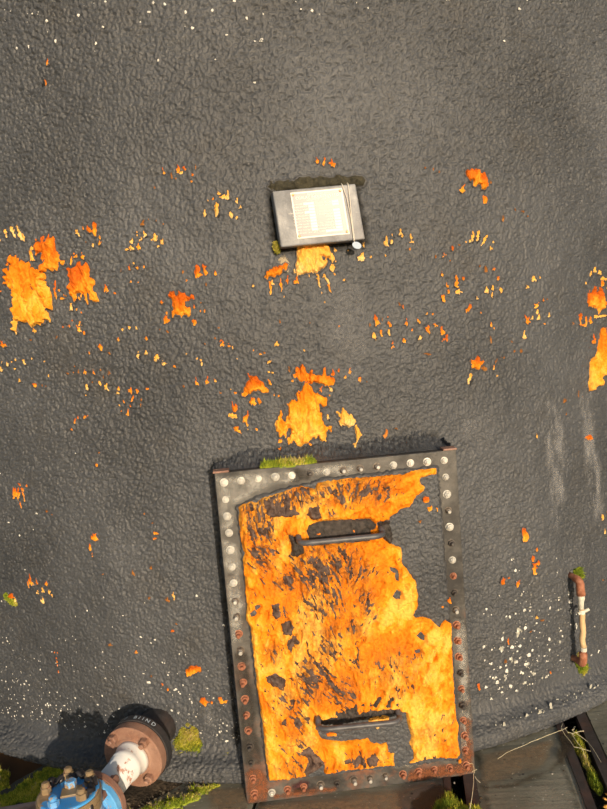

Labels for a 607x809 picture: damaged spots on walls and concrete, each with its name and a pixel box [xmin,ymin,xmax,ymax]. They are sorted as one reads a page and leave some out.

peeling [459,167,492,205]
peeling [0,220,116,341]
peeling [136,336,176,368]
peeling [159,288,206,333]
peeling [181,263,218,287]
peeling [263,241,372,303]
peeling [572,266,607,398]
peeling [195,350,367,450]
rust [408,718,474,781]